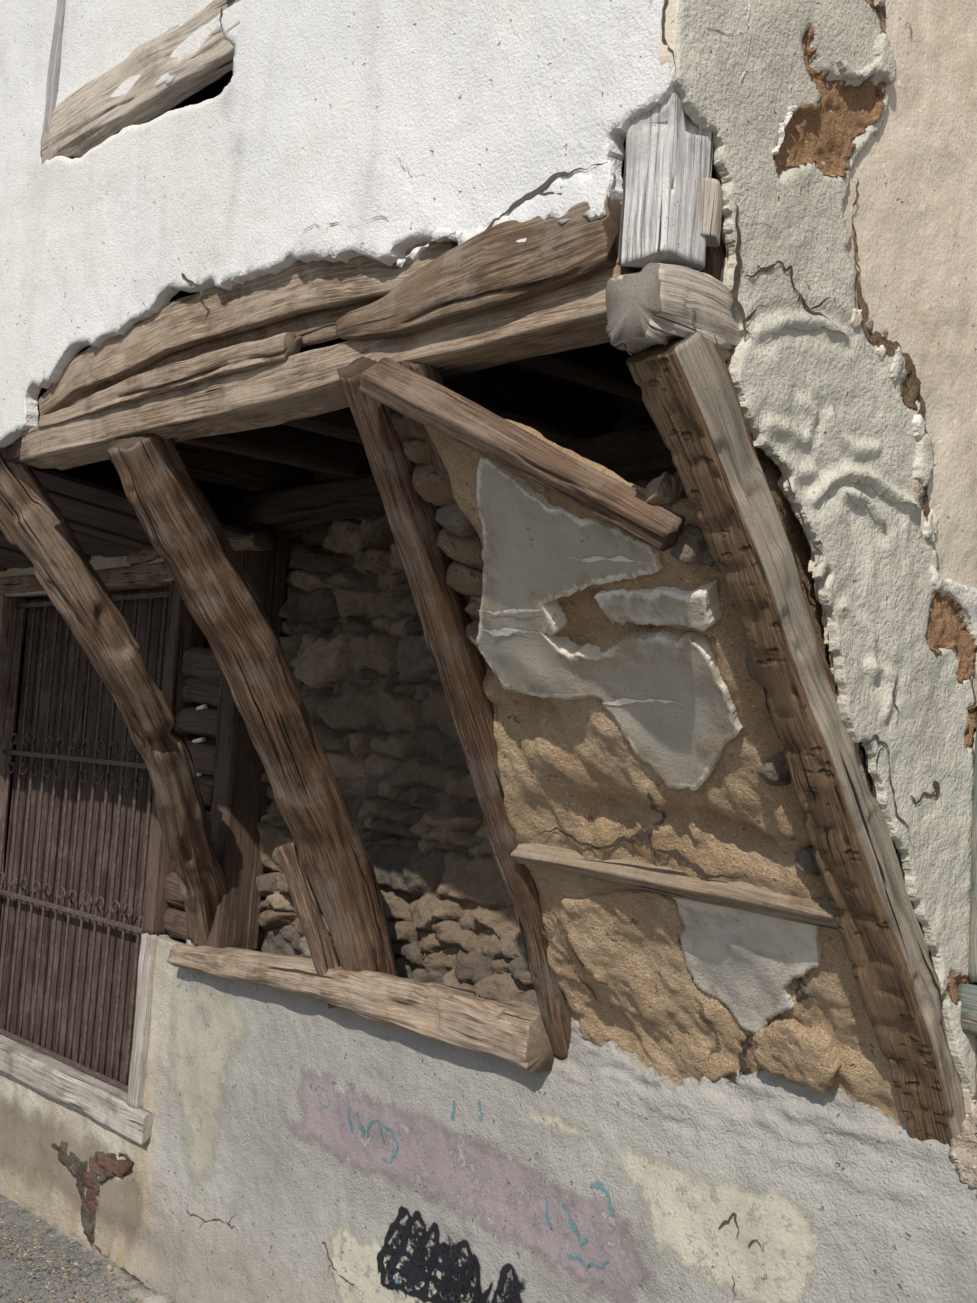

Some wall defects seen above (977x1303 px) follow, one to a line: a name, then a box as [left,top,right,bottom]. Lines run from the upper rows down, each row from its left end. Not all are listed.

crack [648,0,676,93]
crack [732,202,838,340]
flaking render [771,0,939,544]
peeling [476,455,743,791]
flaking render [925,565,977,683]
crack [536,792,744,879]
flaking render [537,889,841,1094]
flaking render [948,1098,977,1194]